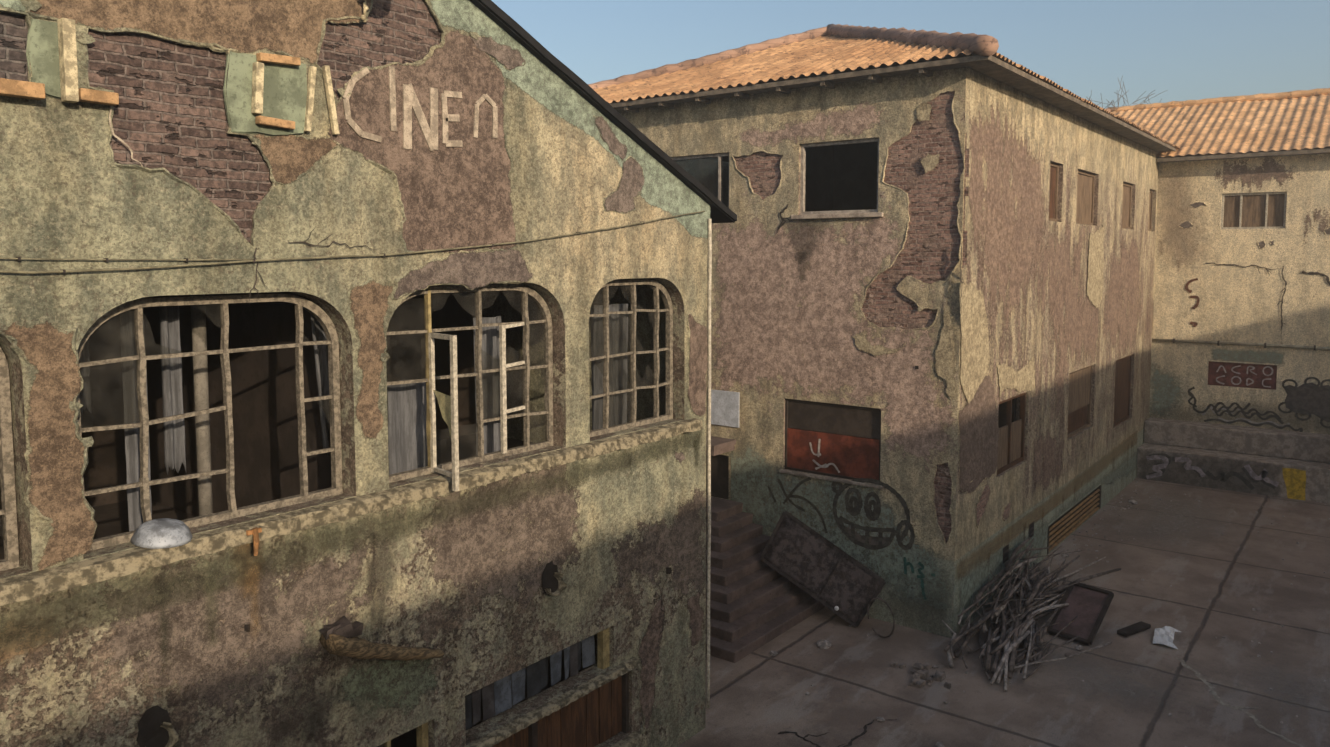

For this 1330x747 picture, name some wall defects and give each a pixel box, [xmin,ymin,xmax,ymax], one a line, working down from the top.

peeling [0,0,1125,613]
crack [1205,262,1330,345]
peeling [84,522,390,733]
peeling [610,488,708,737]
crack [778,719,897,747]